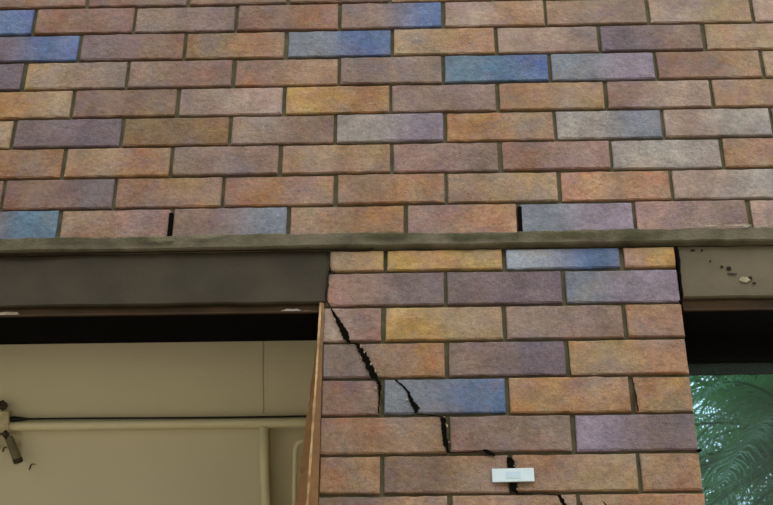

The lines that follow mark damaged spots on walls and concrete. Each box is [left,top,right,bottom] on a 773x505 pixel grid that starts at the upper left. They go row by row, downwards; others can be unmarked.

crack [0,248,582,505]